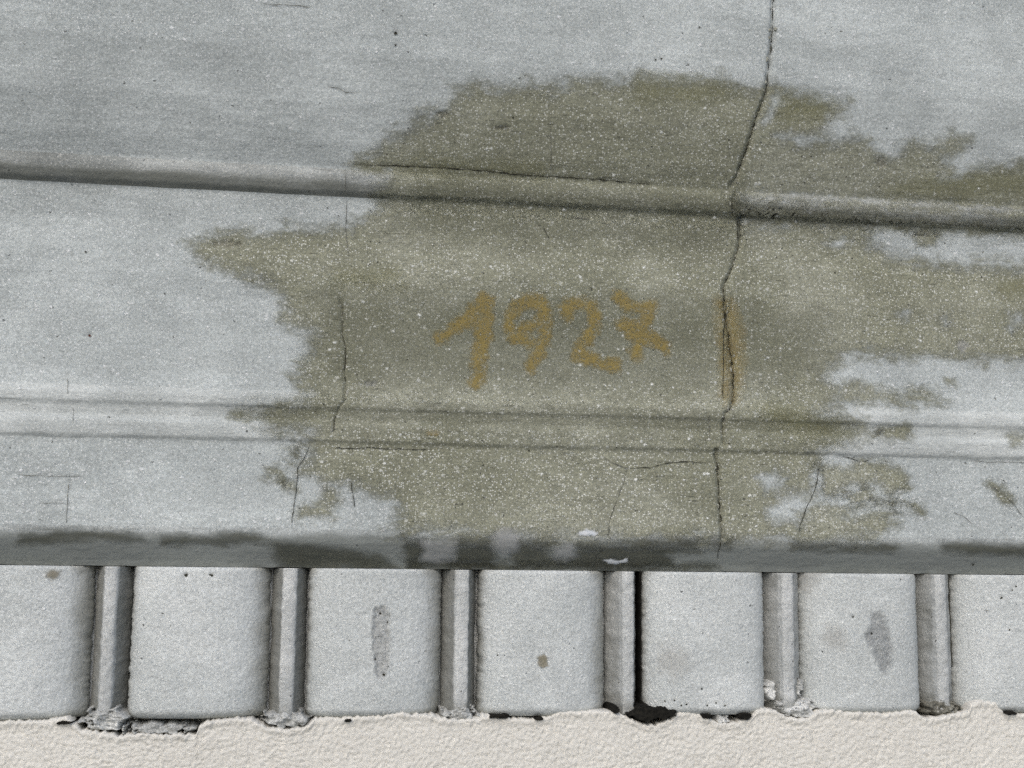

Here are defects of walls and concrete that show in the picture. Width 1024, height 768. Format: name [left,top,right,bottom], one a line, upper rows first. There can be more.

crack [343,174,351,258]
crack [331,306,427,452]
damp [189,70,1024,561]
crack [596,0,777,564]
crack [291,448,309,527]